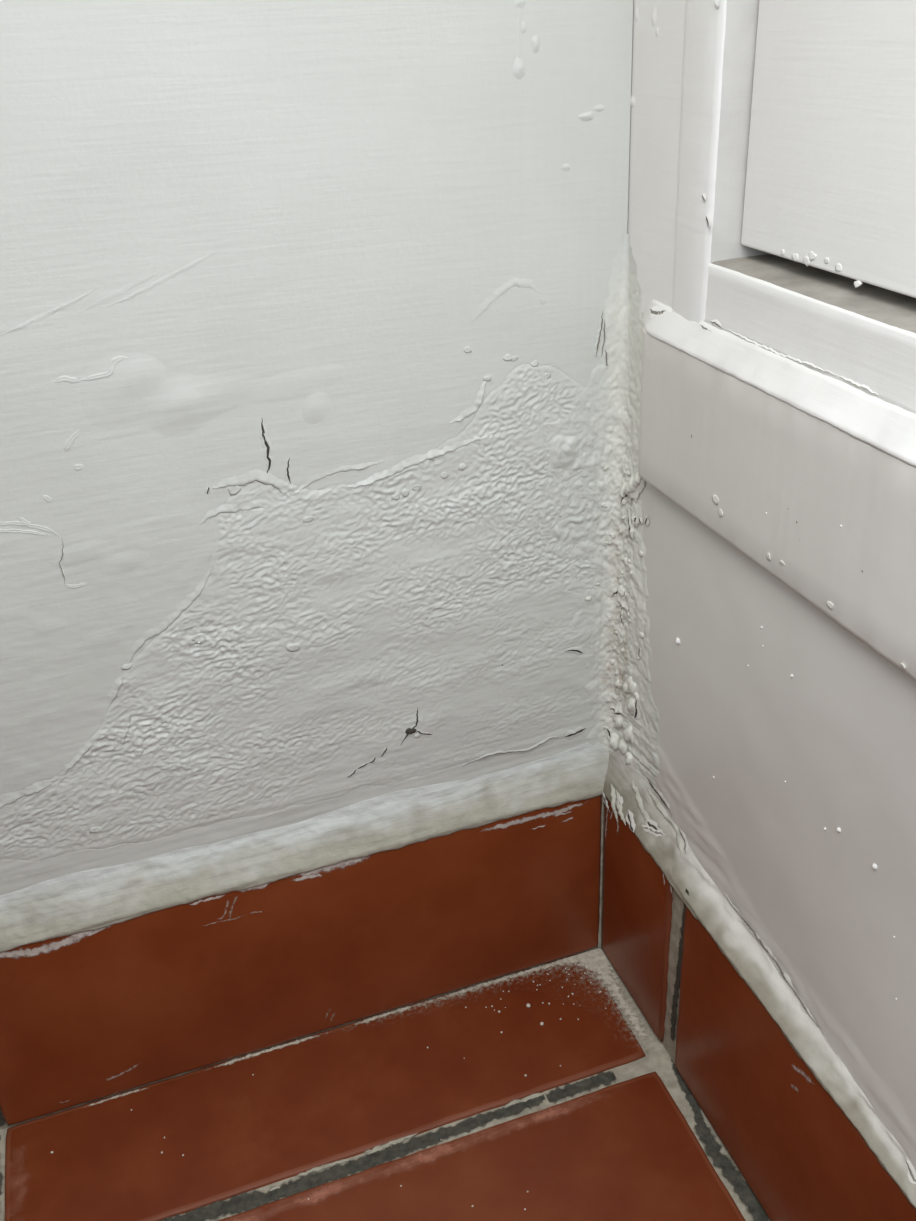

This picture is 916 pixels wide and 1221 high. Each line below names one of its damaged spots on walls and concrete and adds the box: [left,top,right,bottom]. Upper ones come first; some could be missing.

crack [258,418,292,484]
crack [347,707,433,778]
damp [190,895,262,926]
damp [670,889,689,1042]
damp [671,1059,768,1221]